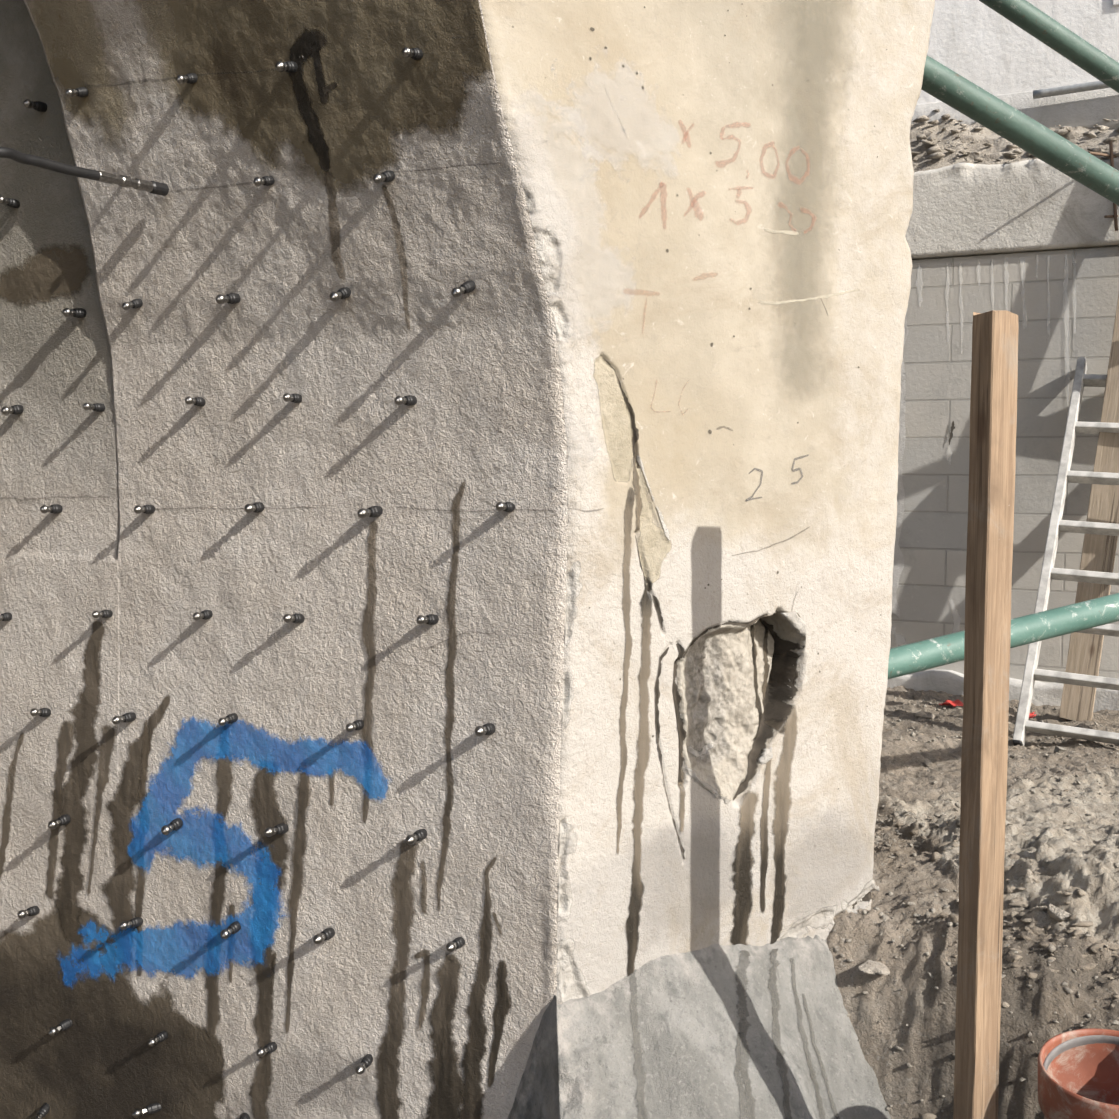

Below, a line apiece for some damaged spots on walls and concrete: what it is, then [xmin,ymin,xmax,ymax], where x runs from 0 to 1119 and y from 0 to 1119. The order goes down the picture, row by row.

damp [0,244,90,306]
damp [32,0,123,130]
damp [138,0,492,329]
damp [0,620,235,1119]
damp [249,766,310,1119]
damp [617,437,652,1119]
crack [652,595,685,859]
spalling [673,610,806,804]
damp [730,703,840,1119]